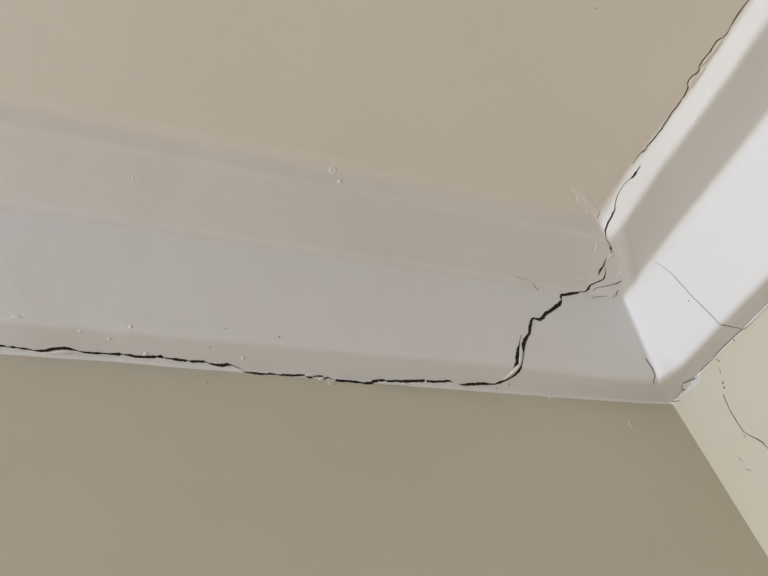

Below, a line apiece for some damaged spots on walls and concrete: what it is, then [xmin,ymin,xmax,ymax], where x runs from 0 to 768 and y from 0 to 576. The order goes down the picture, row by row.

crack [0,0,749,388]
crack [659,264,768,448]